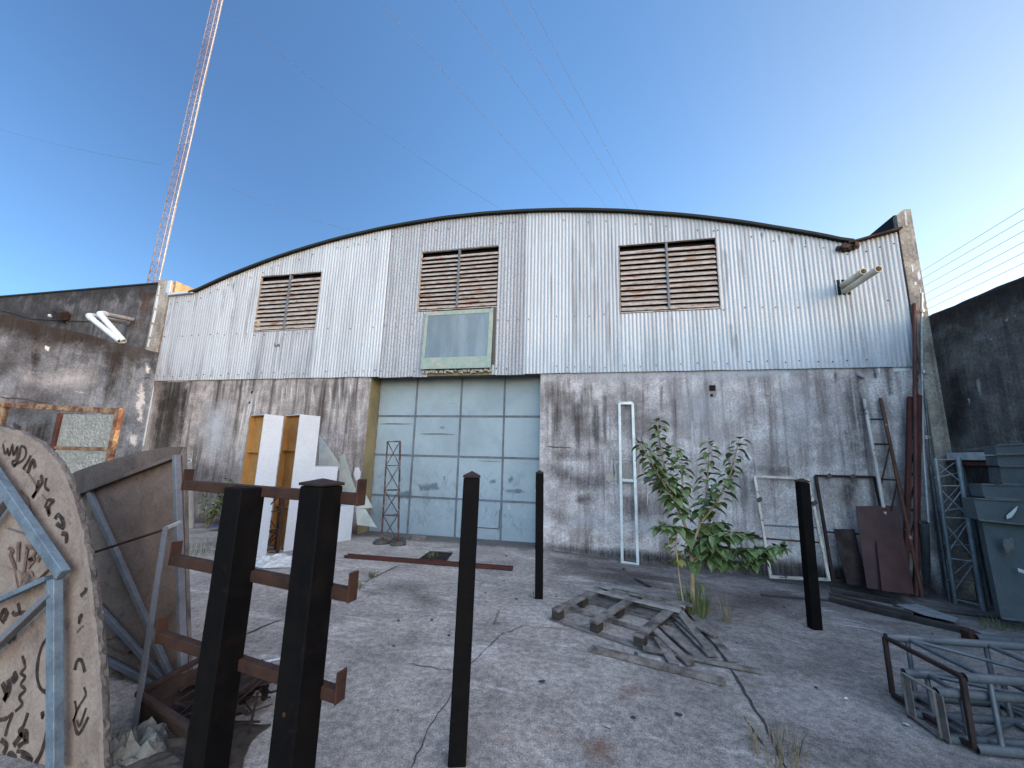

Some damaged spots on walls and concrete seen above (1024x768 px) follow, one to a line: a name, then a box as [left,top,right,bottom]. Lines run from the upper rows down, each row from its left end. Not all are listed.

water stain [0,313,123,375]
water stain [153,382,186,449]
water stain [238,396,257,453]
crack [407,610,563,768]